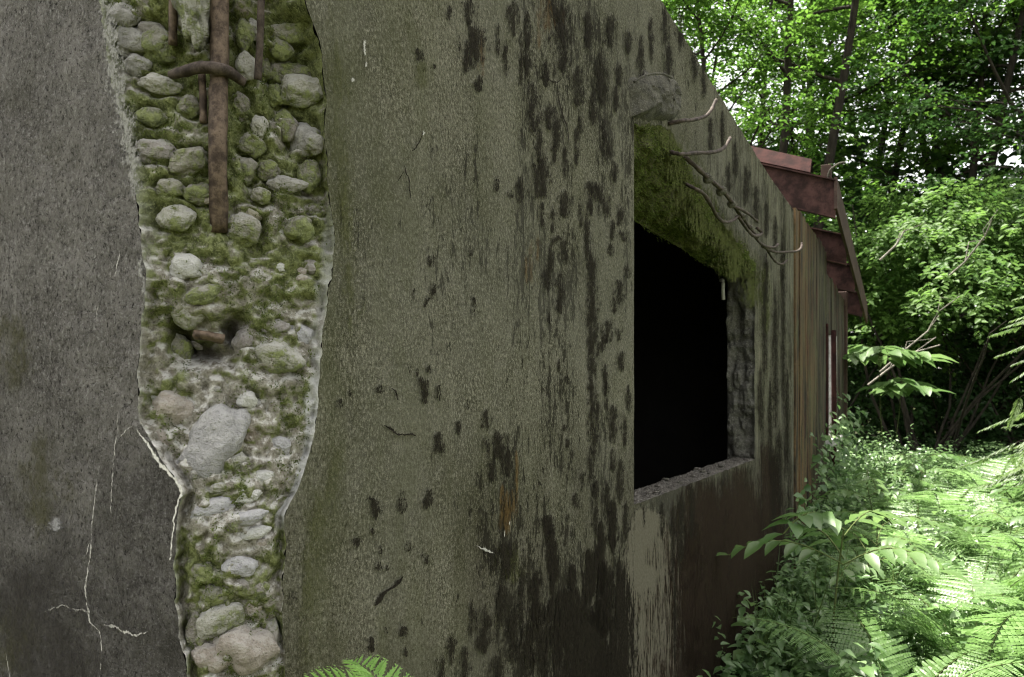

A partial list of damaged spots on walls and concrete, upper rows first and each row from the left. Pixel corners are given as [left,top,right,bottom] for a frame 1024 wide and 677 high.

spalling [99,0,335,677]
damp [433,0,792,677]
damp [408,365,445,404]
crack [45,420,183,669]
damp [351,495,384,548]
damp [423,489,436,509]
damp [385,626,409,657]